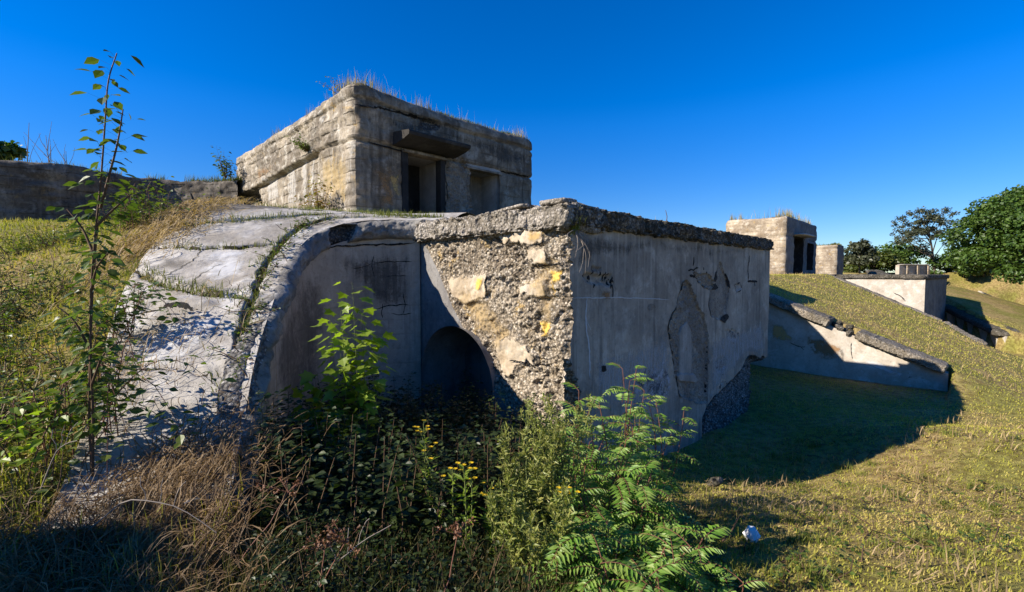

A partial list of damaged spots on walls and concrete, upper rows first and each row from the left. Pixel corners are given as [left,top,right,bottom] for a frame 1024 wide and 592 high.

crack [329,242,415,318]
spalling [423,230,613,477]
peeling [628,262,765,434]